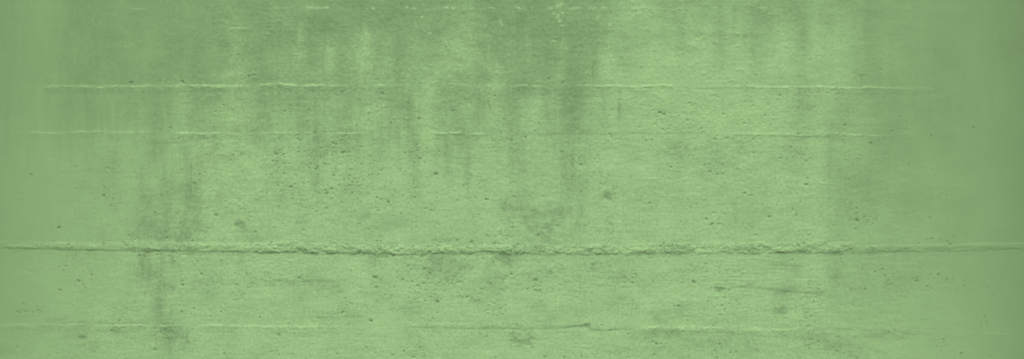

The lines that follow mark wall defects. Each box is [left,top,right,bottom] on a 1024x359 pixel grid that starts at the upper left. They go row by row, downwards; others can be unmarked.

leakage [24,92,442,359]
leakage [44,0,503,237]
leakage [393,0,1024,359]